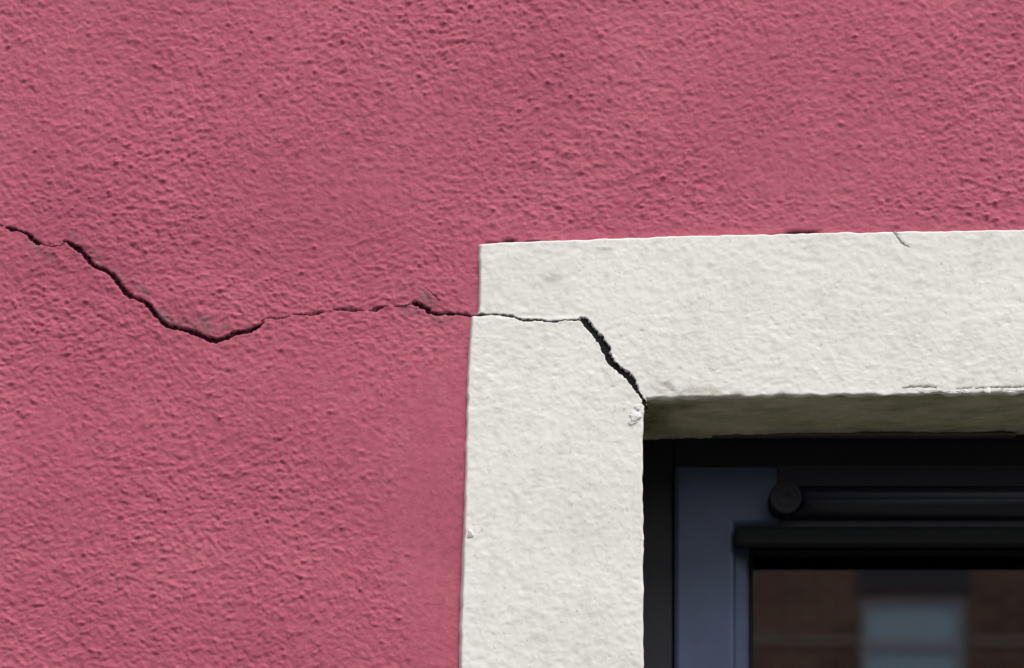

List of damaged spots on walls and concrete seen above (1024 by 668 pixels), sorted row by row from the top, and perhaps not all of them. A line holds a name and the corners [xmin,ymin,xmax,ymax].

crack [0,225,648,413]